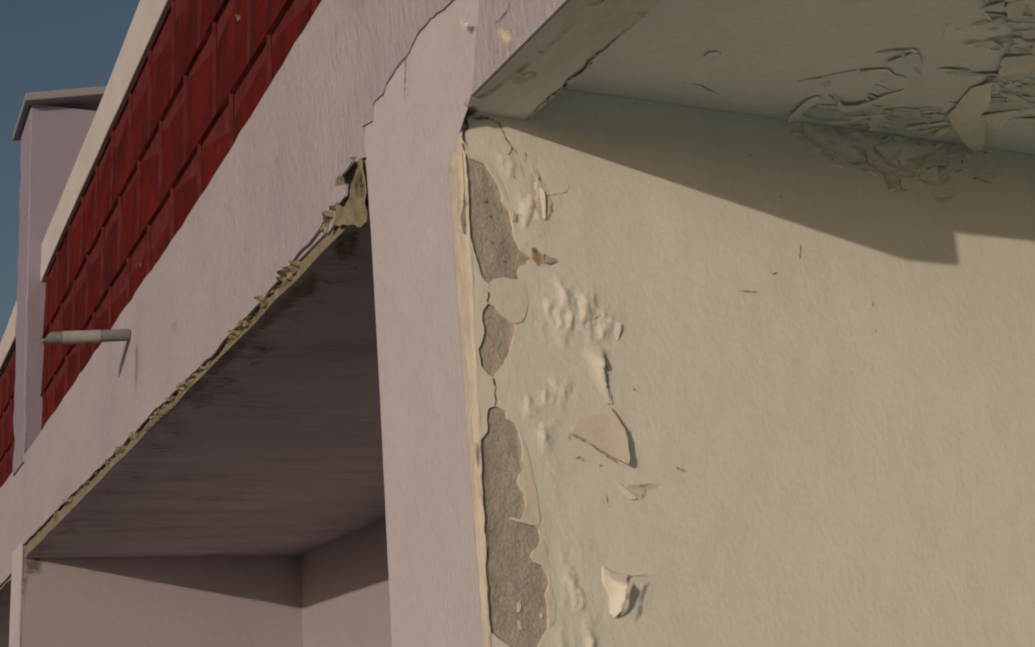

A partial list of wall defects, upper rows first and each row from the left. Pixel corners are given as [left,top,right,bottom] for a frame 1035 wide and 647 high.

flaking render [319,156,371,236]
crack [461,116,527,156]
peeling [460,153,529,285]
crack [532,39,616,114]
peeling [826,0,1035,154]
flaking render [149,260,302,420]
peeling [478,304,515,377]
flaking render [26,430,140,551]
peeling [476,407,548,647]
peeling [572,405,630,464]